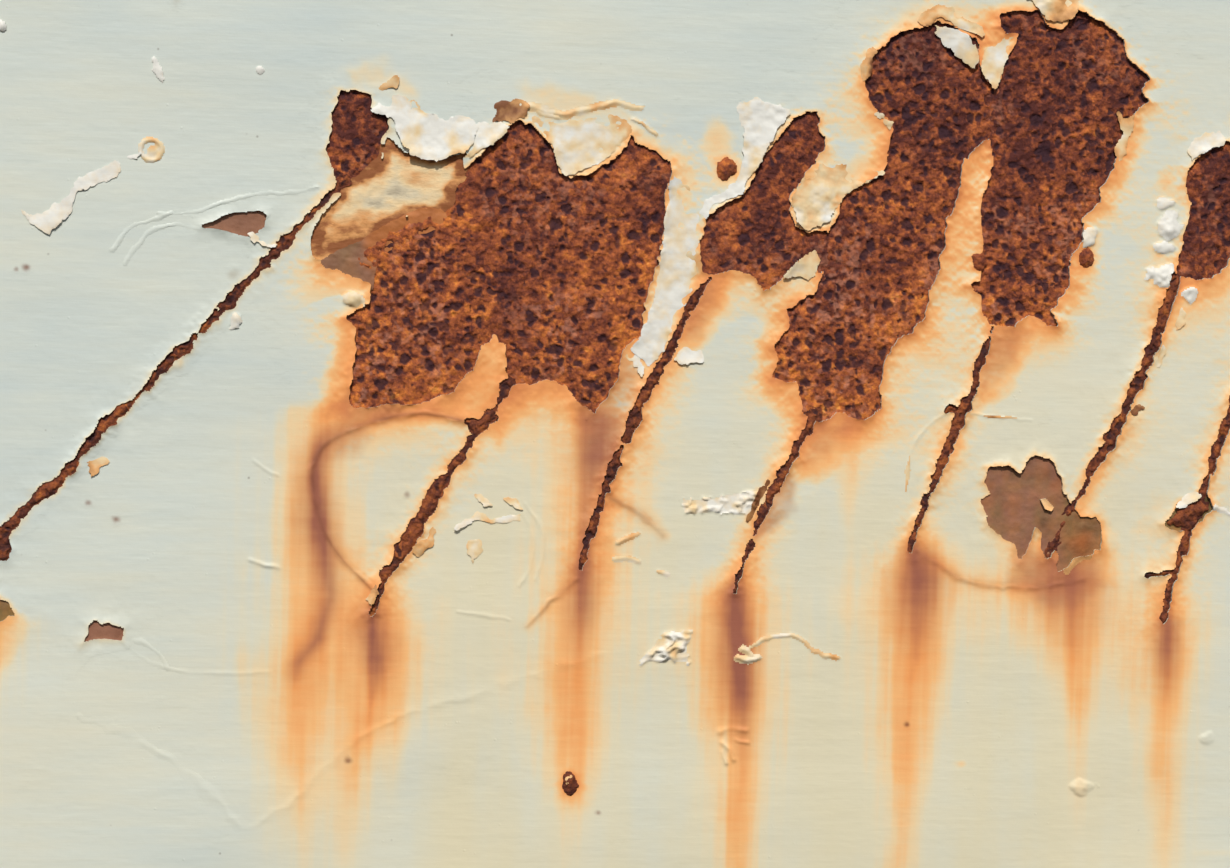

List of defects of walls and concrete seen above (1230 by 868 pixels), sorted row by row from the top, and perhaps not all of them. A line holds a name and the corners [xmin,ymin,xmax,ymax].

rust [11,262,34,275]
rust [223,266,243,283]
peeling [202,211,276,248]
rust [248,0,1230,868]
peeling [967,441,1101,585]
rust [178,397,478,868]